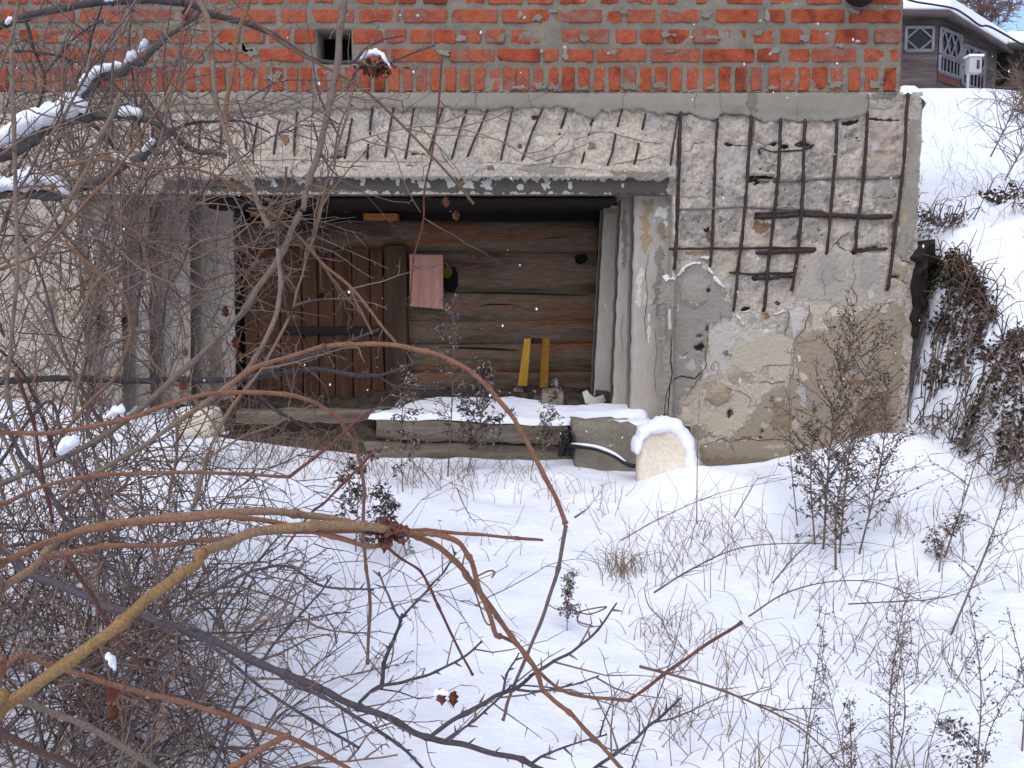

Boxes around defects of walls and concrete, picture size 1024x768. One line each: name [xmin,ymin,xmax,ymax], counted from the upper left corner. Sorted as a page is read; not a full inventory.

spalling [841,100,903,177]
peeling [395,177,430,189]
peeling [444,177,492,190]
peeling [653,205,670,227]
spalling [681,141,852,242]
peeling [635,267,653,307]
spalling [662,233,768,292]
peeling [773,296,855,337]
peeling [679,307,755,425]
peeling [746,377,786,449]